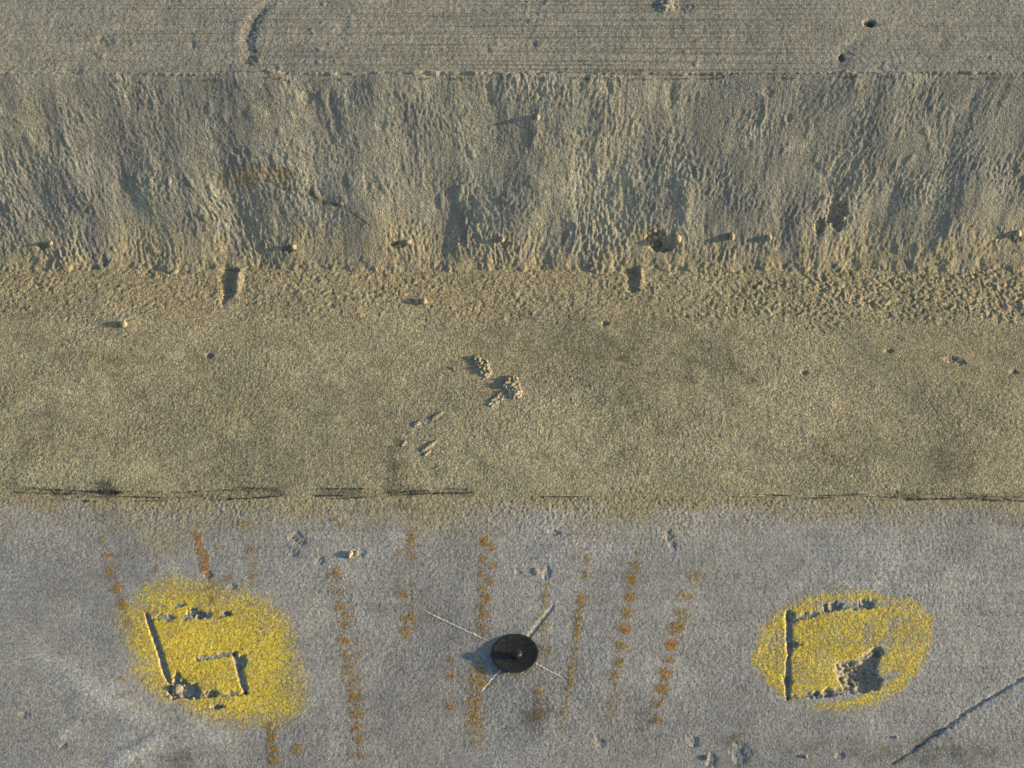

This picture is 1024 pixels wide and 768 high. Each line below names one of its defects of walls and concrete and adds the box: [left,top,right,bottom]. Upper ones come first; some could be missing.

corrosion [191,532,232,622]
corrosion [477,535,496,633]
spalling [167,672,222,710]
corrosion [327,566,366,760]
corrosion [466,663,488,743]
corrosion [567,594,589,689]
corrosion [606,549,643,720]
corrosion [651,574,699,723]
spalling [813,647,883,698]